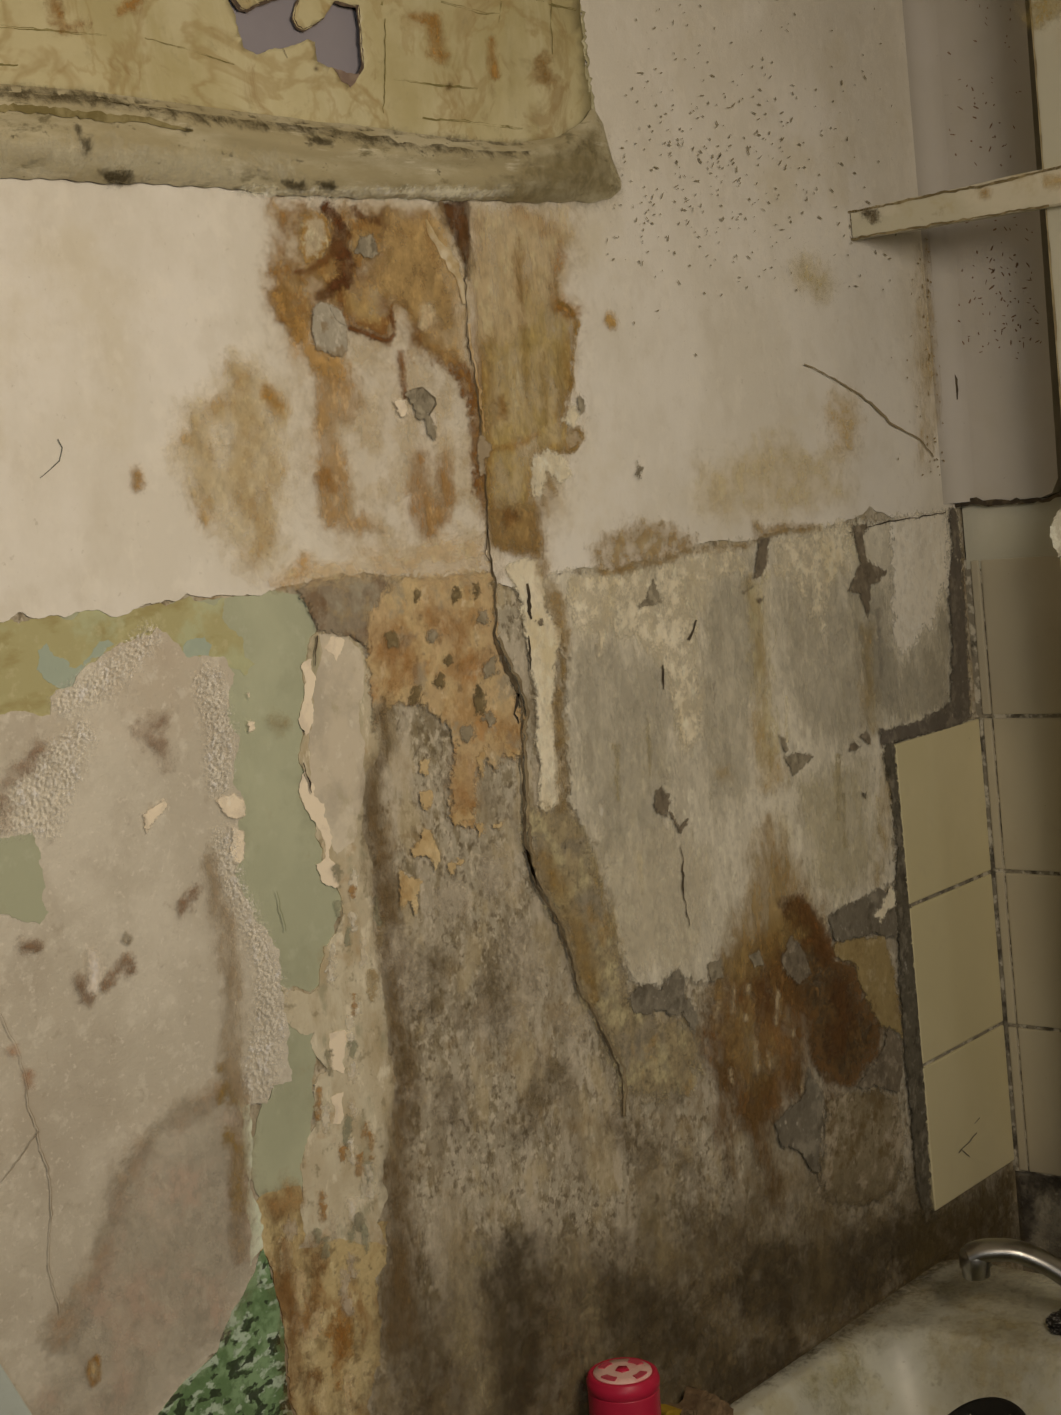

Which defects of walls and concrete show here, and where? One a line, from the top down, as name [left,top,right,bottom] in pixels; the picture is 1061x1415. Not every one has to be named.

peeling [242,186,520,201]
water stain [607,44,853,291]
water stain [182,364,289,558]
water stain [269,181,584,582]
water stain [596,520,704,574]
crack [804,364,934,457]
crack [850,494,1060,533]
crack [952,375,960,400]
crack [1045,209,1061,410]
crack [464,251,629,1117]
peeling [0,507,973,1415]
water stain [367,761,1061,1415]